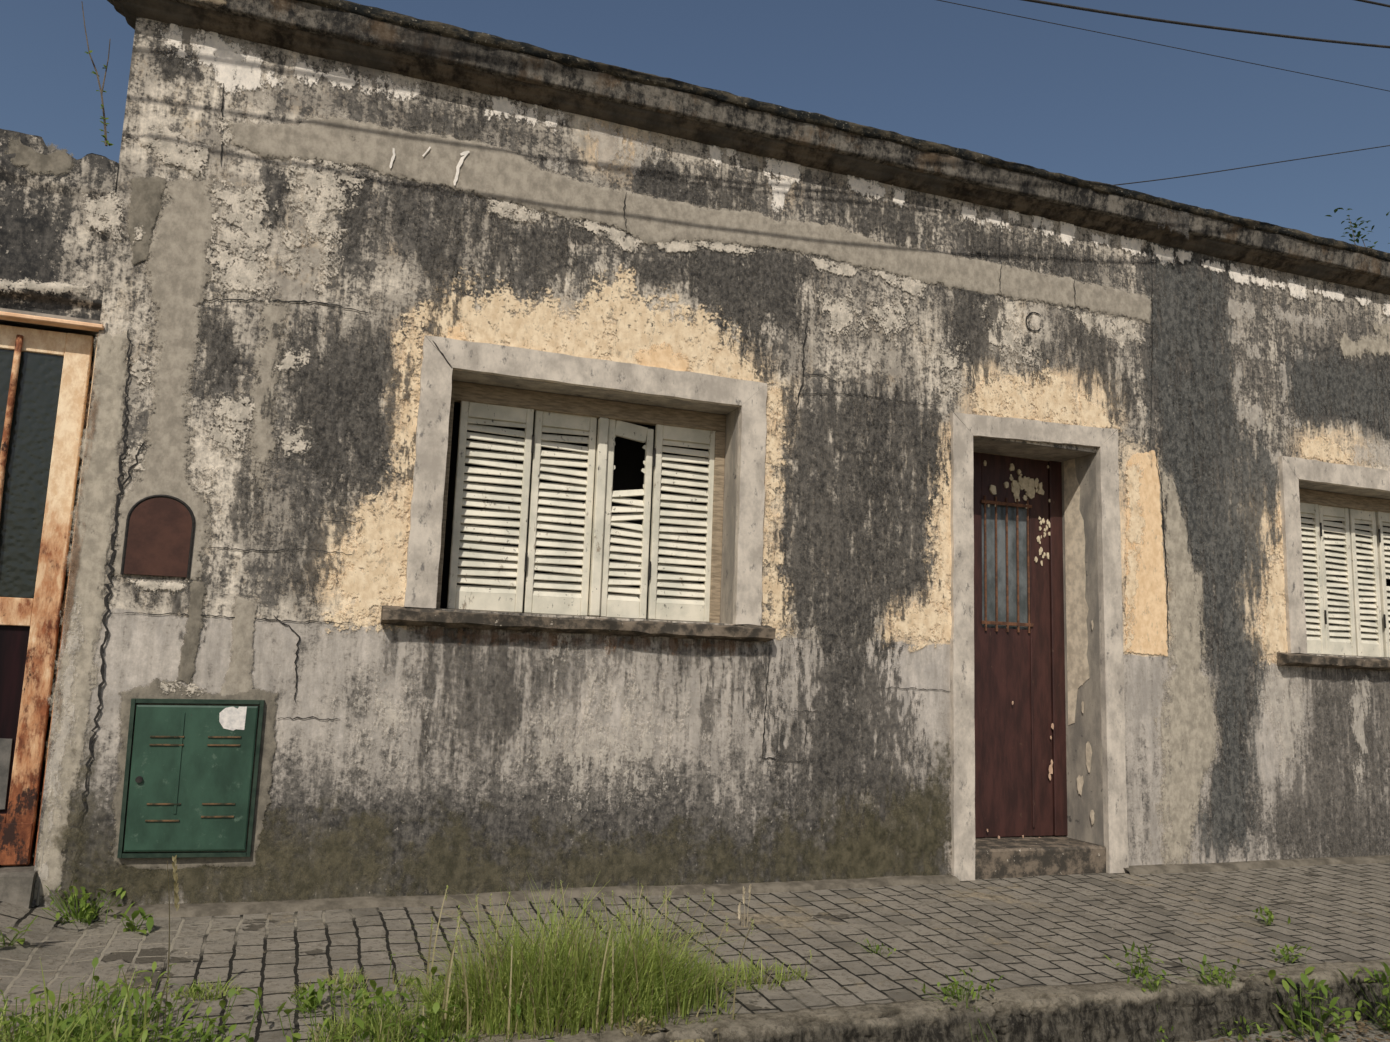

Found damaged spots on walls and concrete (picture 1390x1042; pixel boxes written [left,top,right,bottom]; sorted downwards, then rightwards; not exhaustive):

water stain [589,123,801,213]
crack [69,329,364,893]
water stain [90,156,1390,907]
peeling [987,459,1094,740]